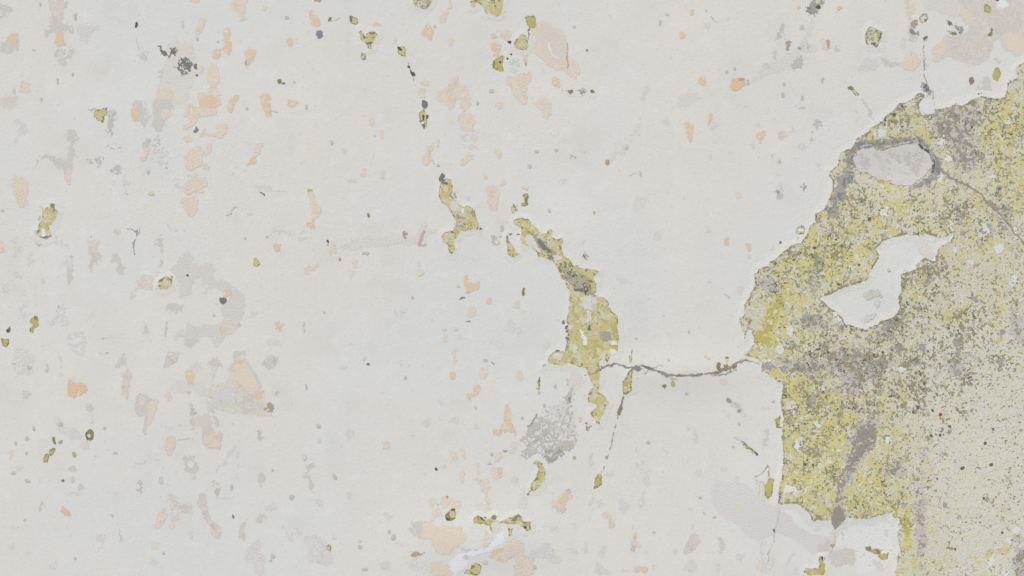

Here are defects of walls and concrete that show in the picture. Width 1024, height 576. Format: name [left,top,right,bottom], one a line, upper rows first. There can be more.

peeling [11,175,64,246]
peeling [433,152,506,261]
peeling [500,193,638,431]
crack [584,346,767,379]
peeling [716,51,1024,576]
crack [601,395,625,473]
peeling [420,447,536,576]